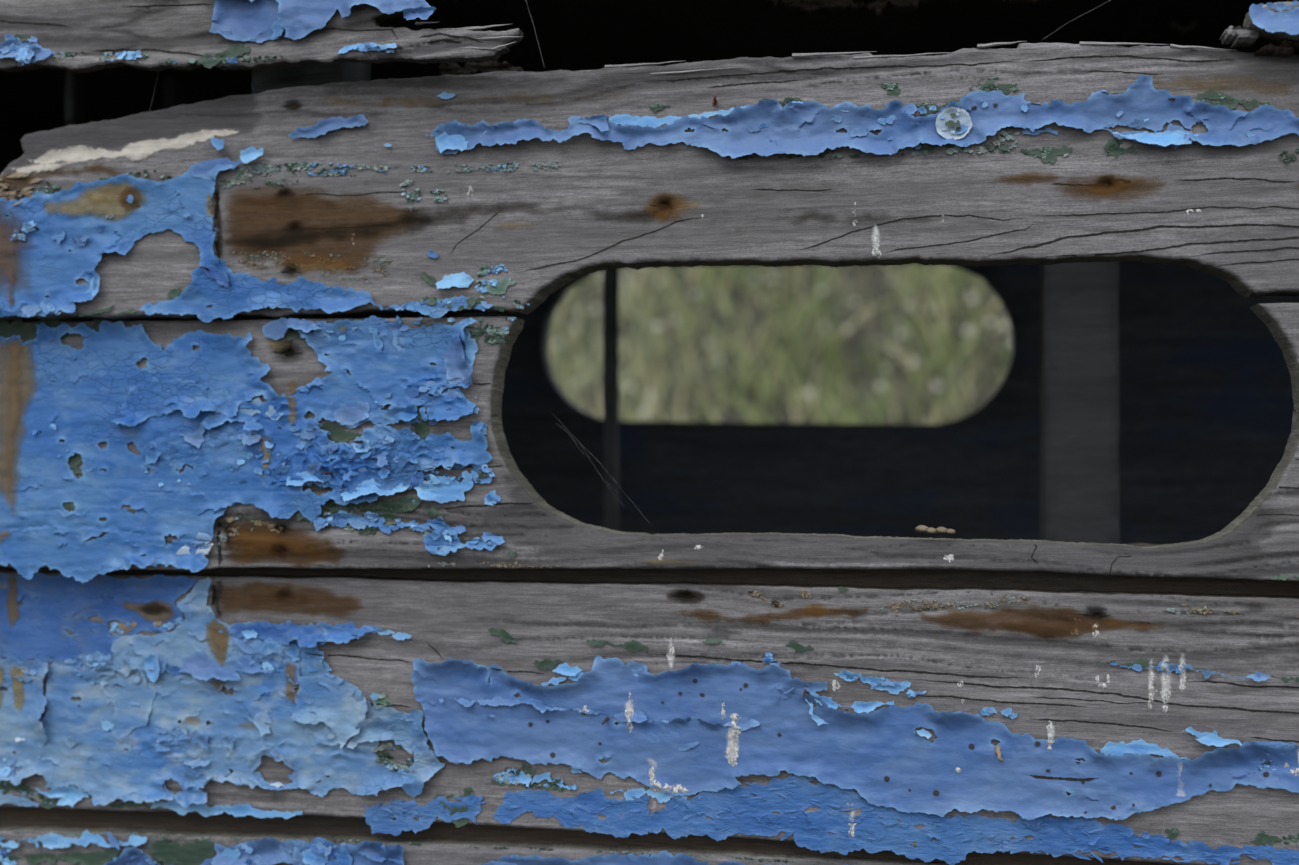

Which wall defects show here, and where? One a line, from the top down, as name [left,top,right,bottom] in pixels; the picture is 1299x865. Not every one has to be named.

peeling [115,50,143,60]
peeling [209,0,437,64]
peeling [1249,0,1299,35]
peeling [211,137,224,151]
peeling [425,75,1299,162]
corrosion [207,189,221,254]
peeling [0,146,516,323]
peeling [0,315,1299,865]